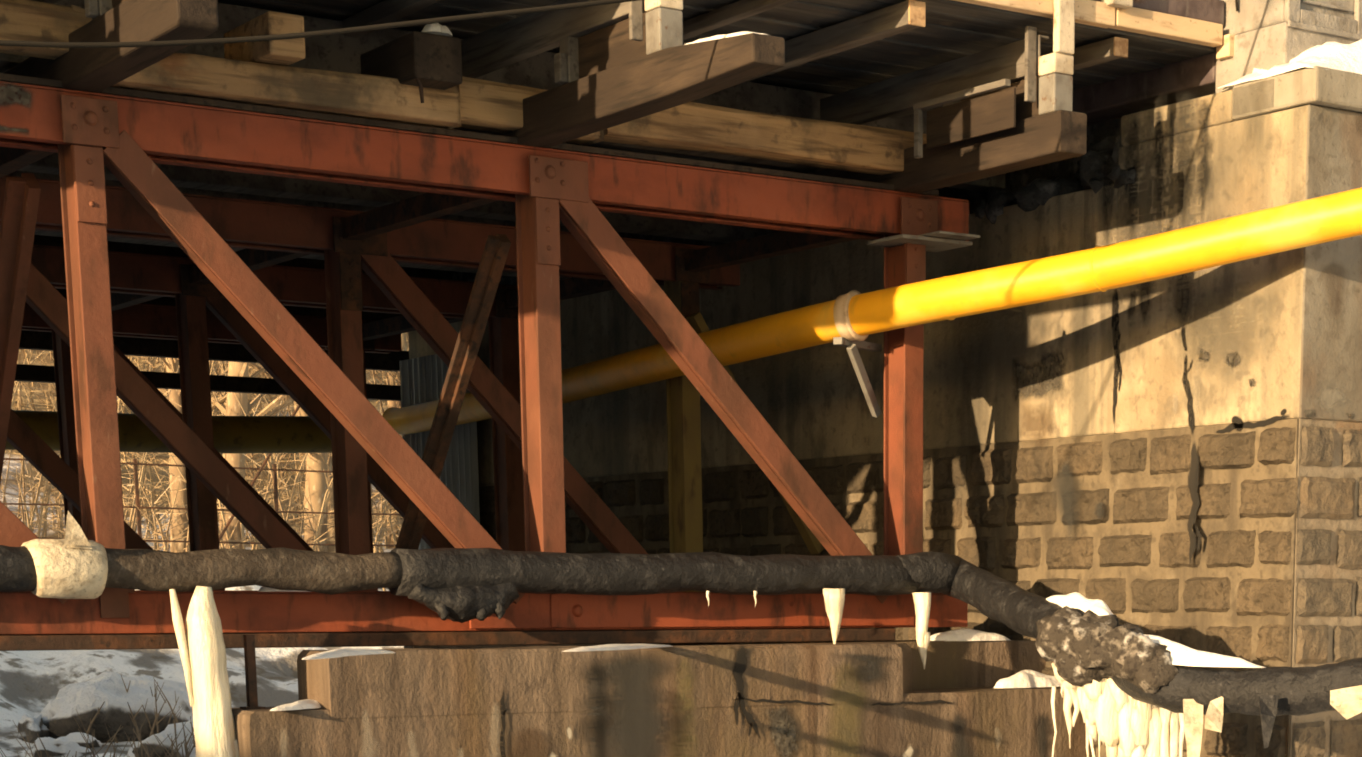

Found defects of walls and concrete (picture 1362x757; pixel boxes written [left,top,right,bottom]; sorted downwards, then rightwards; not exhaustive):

water stain [1104,96,1223,242]
water stain [1128,282,1149,320]
water stain [1176,272,1193,320]
crack [1112,290,1122,422]
crack [1181,327,1287,563]
water stain [567,657,668,757]
crack [733,645,761,740]